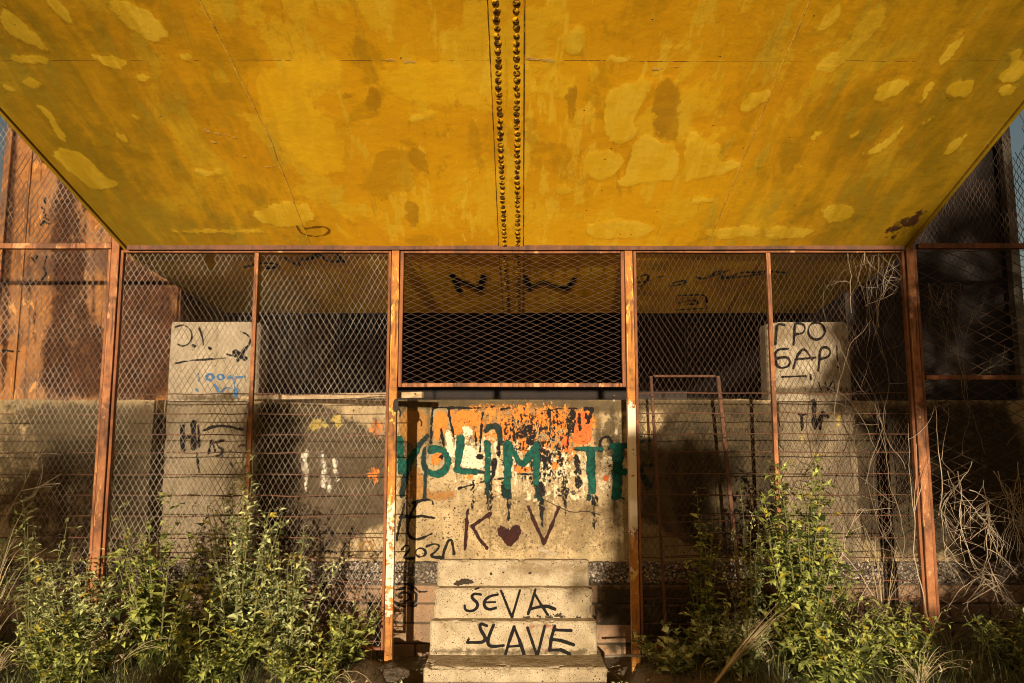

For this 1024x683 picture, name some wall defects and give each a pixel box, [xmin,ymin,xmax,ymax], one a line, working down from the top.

corrosion [1,133,17,390]
corrosion [28,180,103,398]
corrosion [886,210,922,239]
peeling [398,401,628,560]